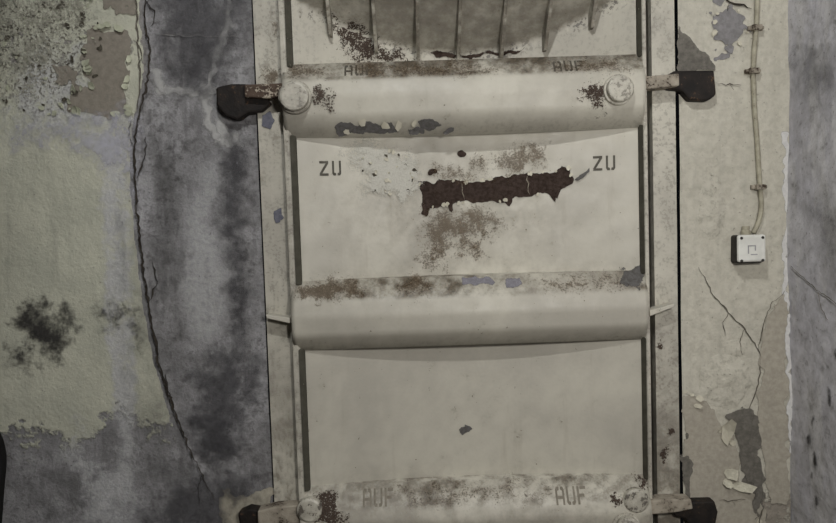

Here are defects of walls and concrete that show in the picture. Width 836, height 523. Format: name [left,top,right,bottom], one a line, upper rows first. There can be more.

peeling [0,0,137,120]
damp [152,0,242,148]
peeling [677,0,752,71]
damp [15,296,77,361]
crack [128,0,214,499]
corrosion [298,277,365,306]
corrosion [414,208,504,267]
crack [698,267,785,408]
peeling [781,132,792,453]
damp [191,365,244,458]
corrosion [313,490,349,523]
peeling [681,390,767,523]